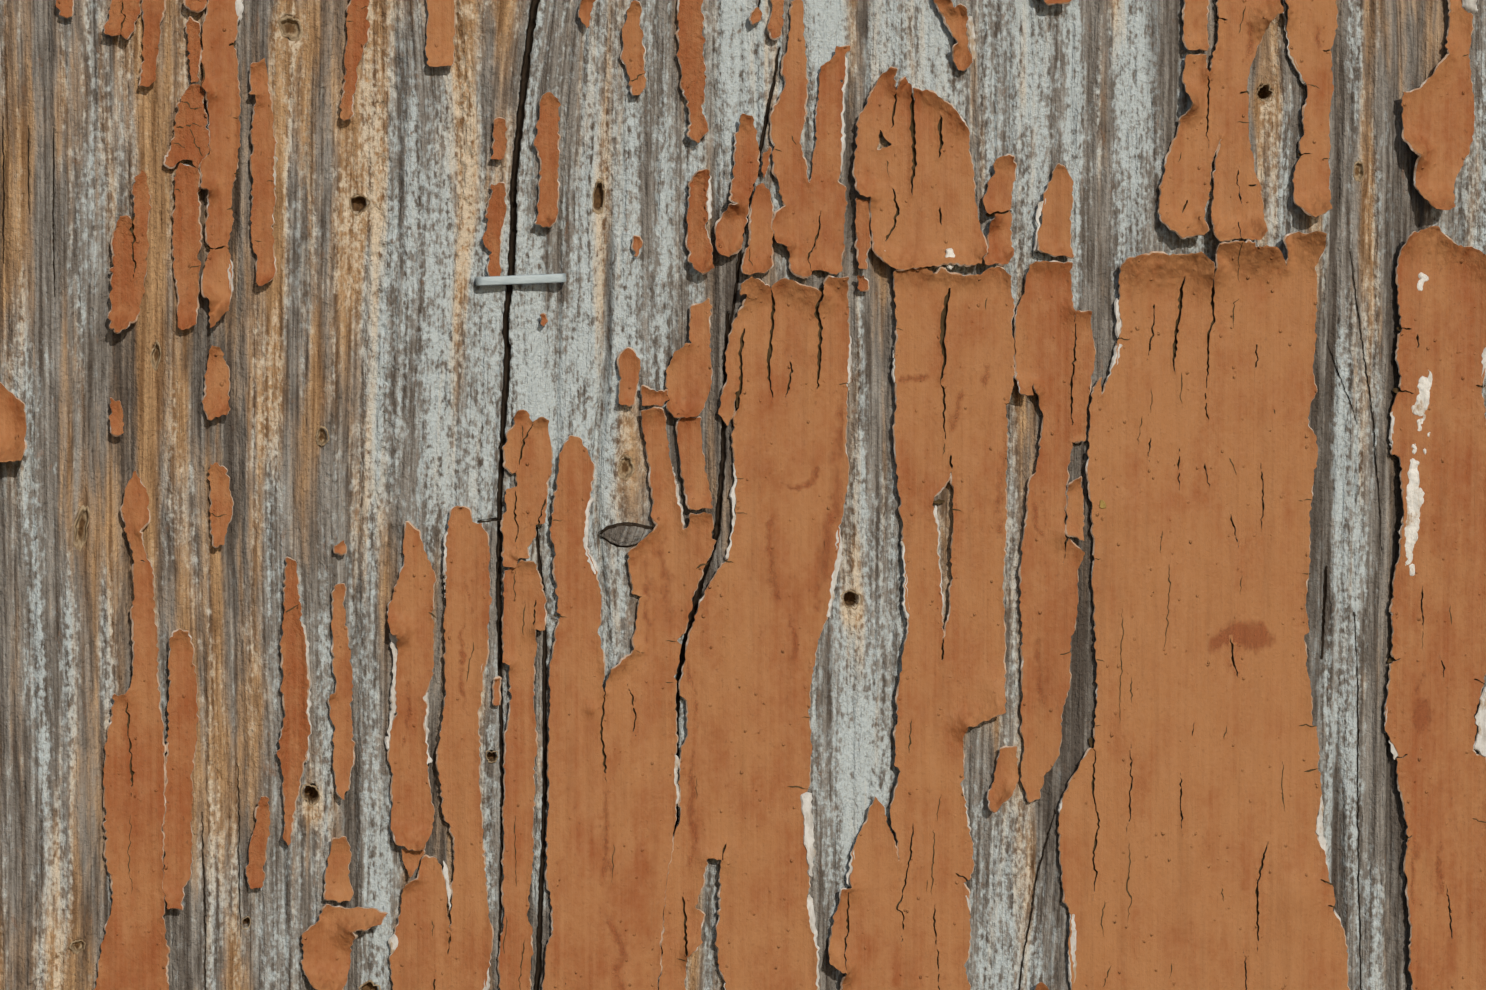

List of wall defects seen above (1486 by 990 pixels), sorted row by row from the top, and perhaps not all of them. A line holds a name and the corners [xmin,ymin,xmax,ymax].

peeling [0,382,27,462]
peeling [108,170,152,334]
peeling [103,0,166,87]
peeling [93,471,199,990]
peeling [163,0,278,420]
crack [477,0,548,990]
crack [673,47,781,836]
peeling [301,0,1350,990]
peeling [1384,0,1486,990]